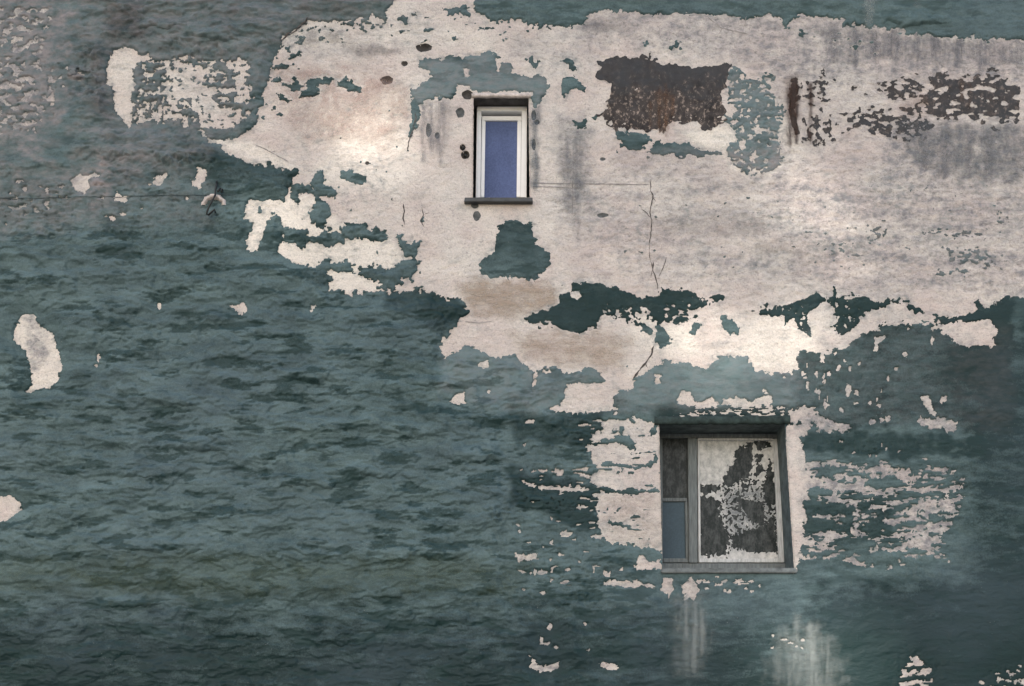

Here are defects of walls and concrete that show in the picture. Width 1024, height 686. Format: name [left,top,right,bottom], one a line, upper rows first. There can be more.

rust [789,83,813,144]
peeling [101,191,128,221]
crack [537,179,667,289]
peeling [106,0,1024,601]
peeling [13,314,63,393]
peeling [528,655,559,673]
peeling [600,662,619,670]
peeling [899,656,933,686]
peeling [995,665,1024,686]